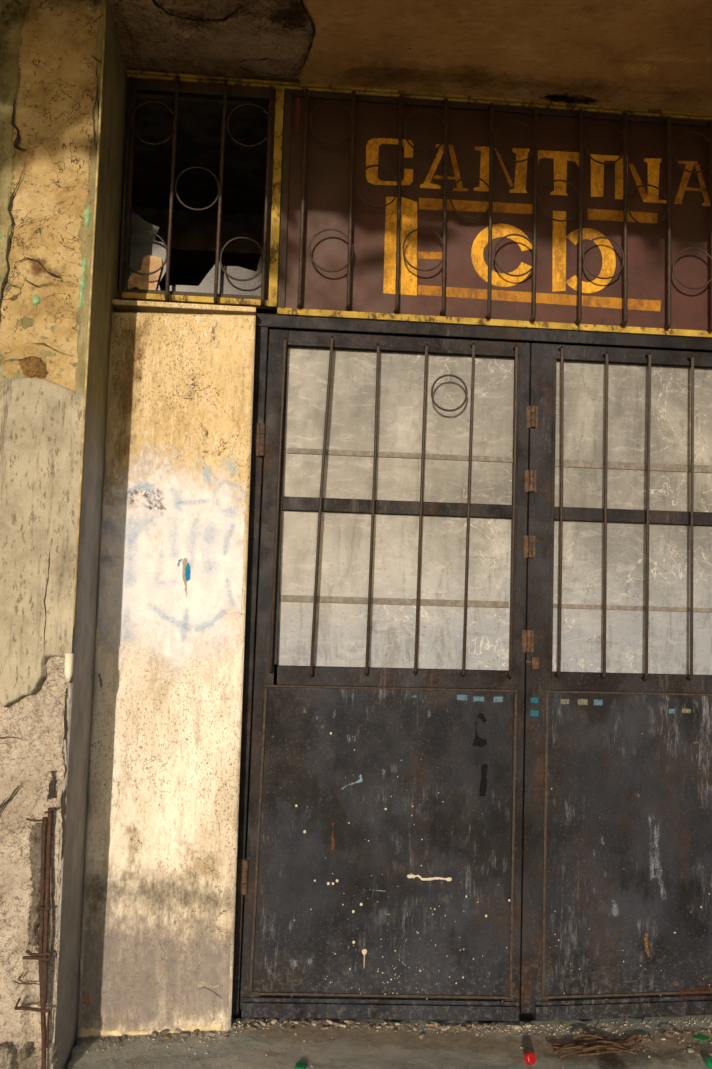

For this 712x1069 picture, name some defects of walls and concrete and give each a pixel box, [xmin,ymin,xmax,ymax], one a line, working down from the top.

crack [152,0,249,22]
crack [237,0,315,77]
peeling [0,0,313,391]
crack [0,783,23,812]
spalling [0,657,68,1069]
water stain [140,879,218,905]
water stain [81,920,231,1028]
spalling [79,1022,224,1038]